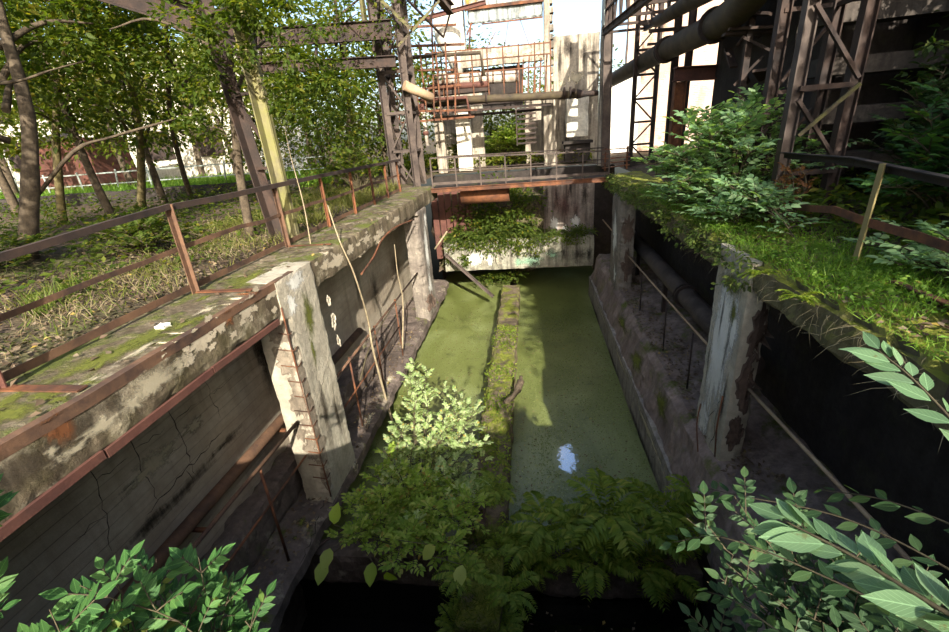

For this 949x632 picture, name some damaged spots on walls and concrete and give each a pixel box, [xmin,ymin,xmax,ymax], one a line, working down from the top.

spalling [314,214,436,312]
spalling [327,295,341,347]
spalling [154,271,332,501]
crack [78,376,233,550]
leakage [137,466,206,536]